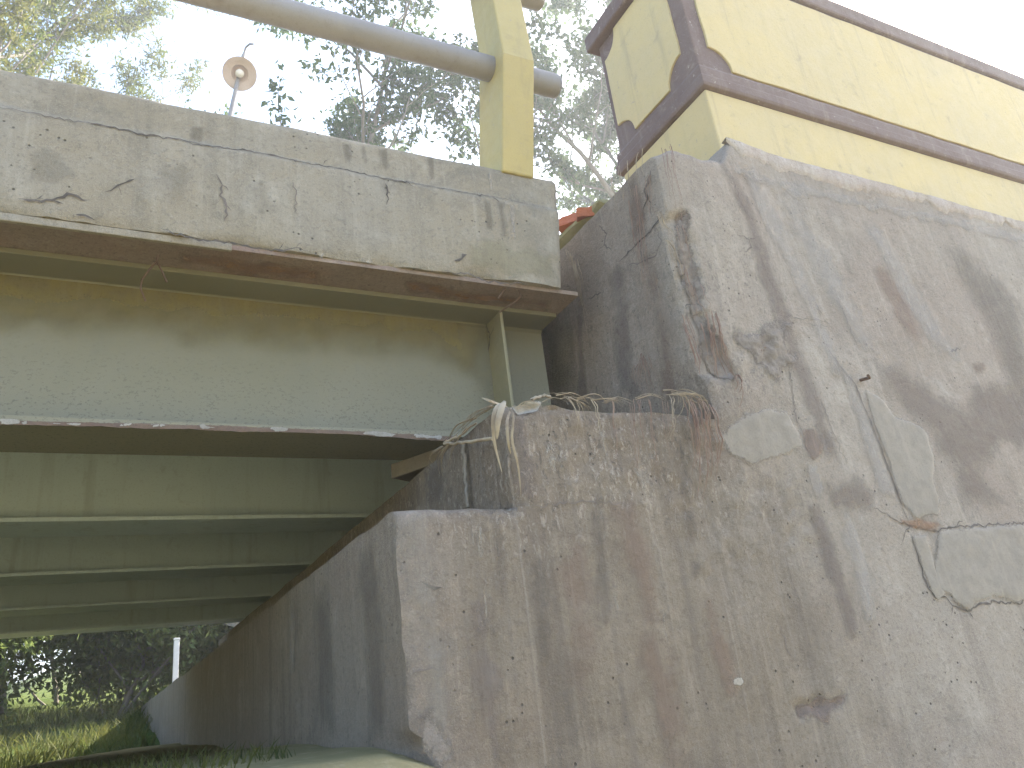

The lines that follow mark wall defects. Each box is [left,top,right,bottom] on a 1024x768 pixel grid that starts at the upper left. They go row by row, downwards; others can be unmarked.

crack [24,179,134,220]
crack [161,174,306,252]
crack [0,107,545,211]
crack [600,171,661,266]
crack [874,508,1024,617]